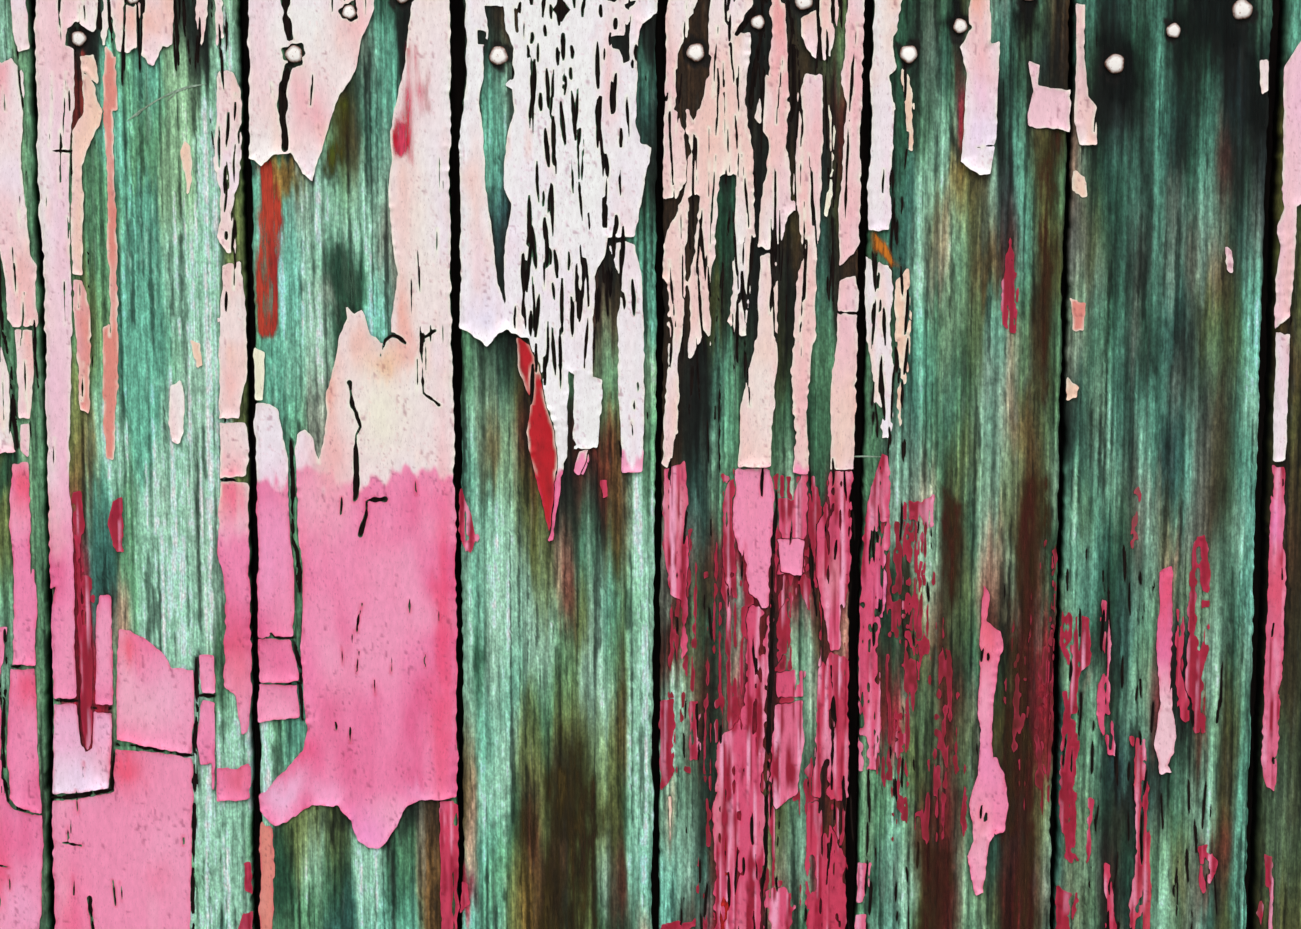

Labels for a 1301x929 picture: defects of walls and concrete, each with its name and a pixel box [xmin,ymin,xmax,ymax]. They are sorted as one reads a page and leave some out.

peeling [960,0,1000,175]
peeling [1028,3,1097,145]
peeling [1001,238,1019,333]
peeling [1072,170,1087,197]
peeling [1225,247,1233,273]
peeling [0,0,966,929]
peeling [1066,377,1079,401]
peeling [1260,42,1301,791]
peeling [960,540,1094,896]
peeling [1096,600,1116,756]
peeling [1104,535,1211,929]
peeling [1055,886,1079,929]